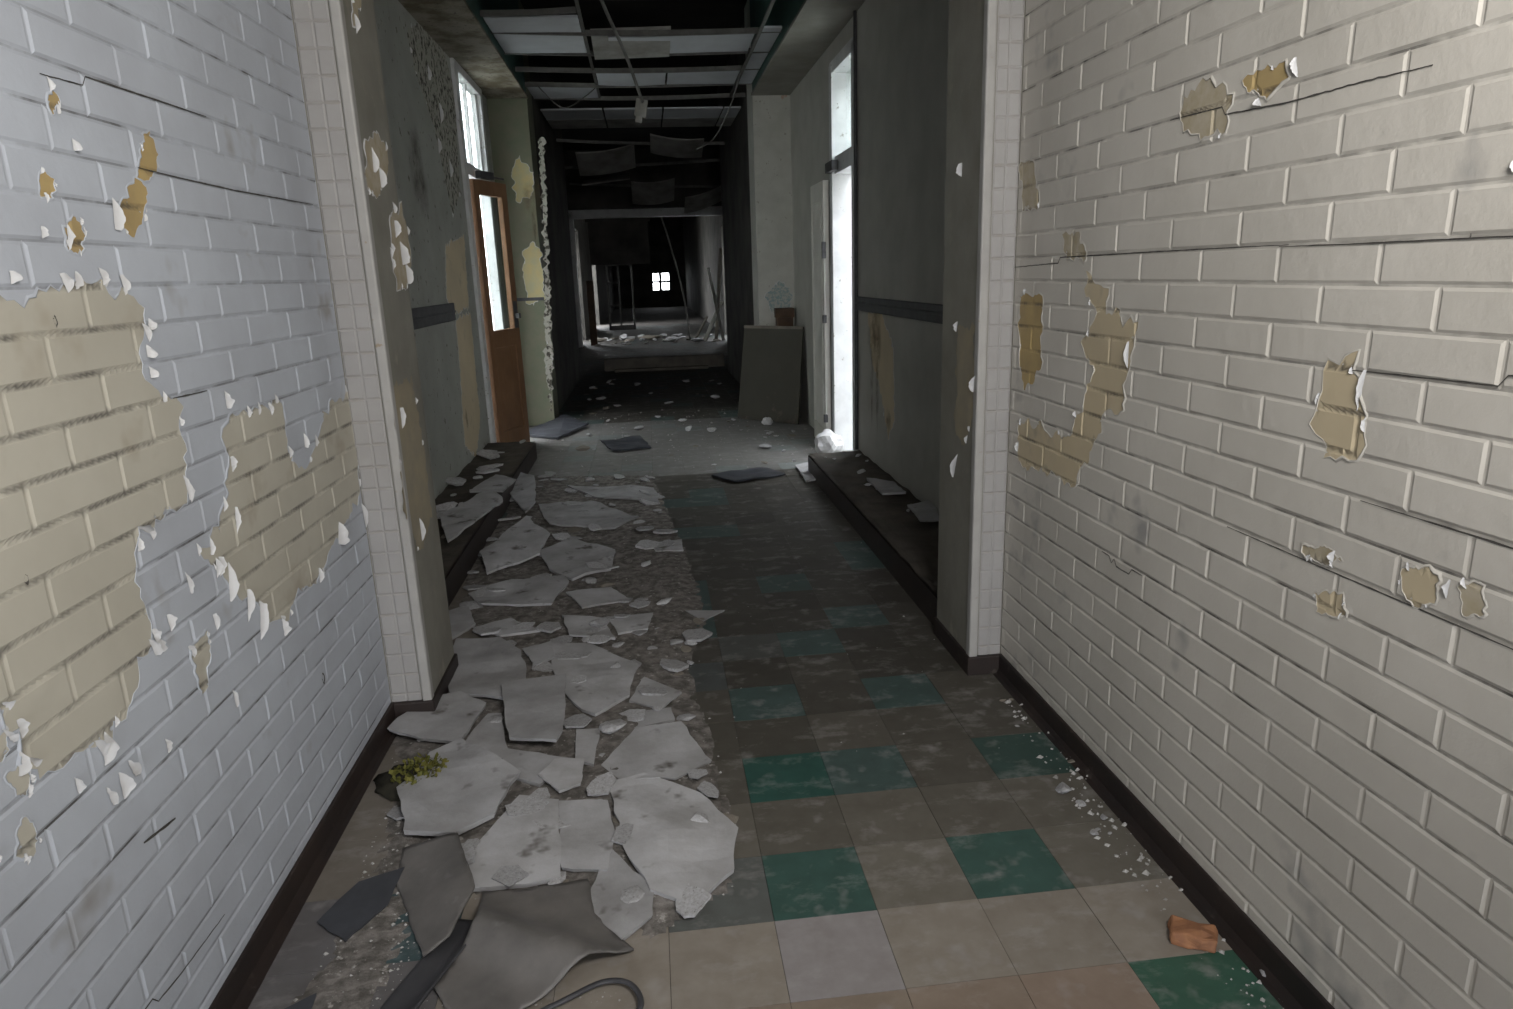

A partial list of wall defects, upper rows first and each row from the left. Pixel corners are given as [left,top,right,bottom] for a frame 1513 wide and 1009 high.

peeling [45,77,62,117]
peeling [1179,57,1298,143]
peeling [37,167,58,203]
peeling [112,129,159,239]
peeling [363,130,414,291]
peeling [1015,230,1139,489]
peeling [1308,349,1368,463]
peeling [0,214,195,865]
peeling [188,385,368,697]